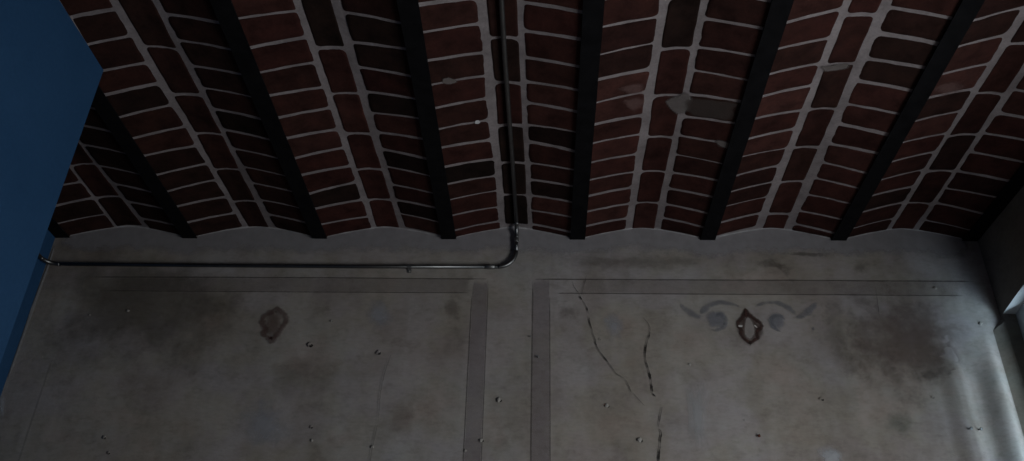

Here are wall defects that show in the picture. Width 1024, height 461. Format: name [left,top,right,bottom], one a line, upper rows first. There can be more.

crack [572,278,662,460]